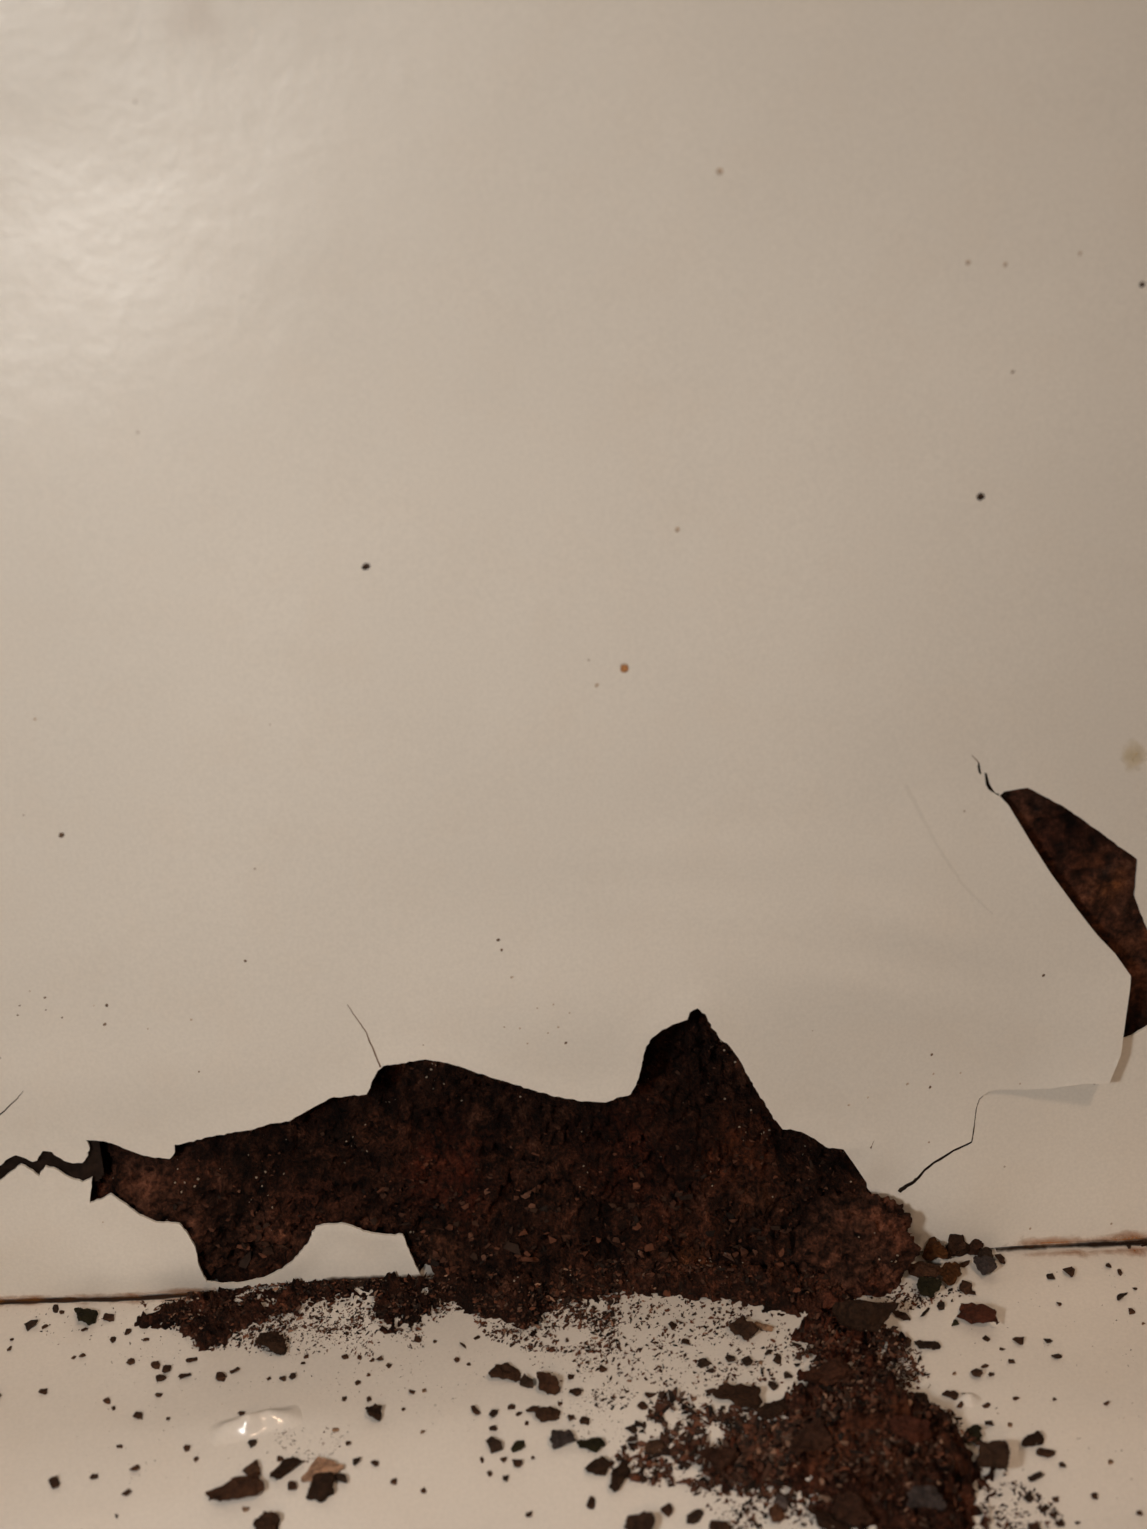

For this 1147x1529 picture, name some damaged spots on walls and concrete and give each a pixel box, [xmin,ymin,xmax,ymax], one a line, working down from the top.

peeling [90,785,1147,1309]
crack [0,1140,104,1184]
crack [898,1096,983,1193]